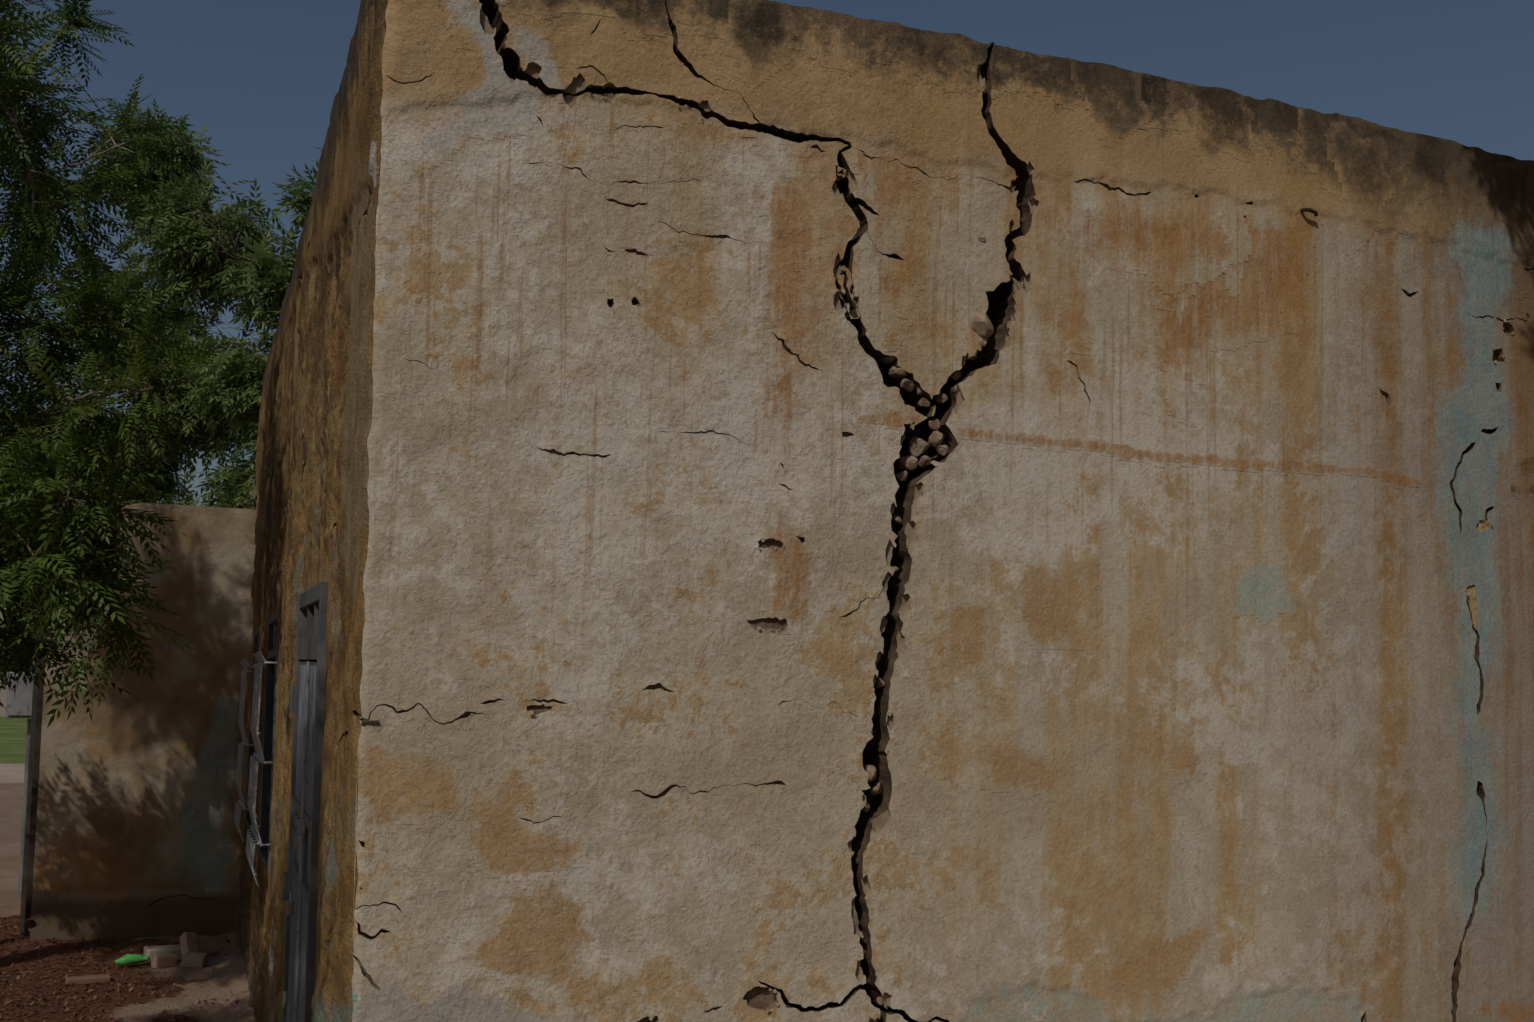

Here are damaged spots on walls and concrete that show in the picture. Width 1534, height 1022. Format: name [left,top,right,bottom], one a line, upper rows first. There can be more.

crack [1074,178,1151,196]
crack [479,0,1039,1022]
leakage [495,0,1534,956]
crack [1450,427,1498,534]
spalling [747,617,788,632]
peeling [927,596,1001,687]
peeling [1009,550,1101,654]
crack [1466,599,1484,714]
peeling [980,735,1074,805]
peeling [352,723,608,1022]
crack [1451,781,1488,1022]
spalling [743,986,780,1013]